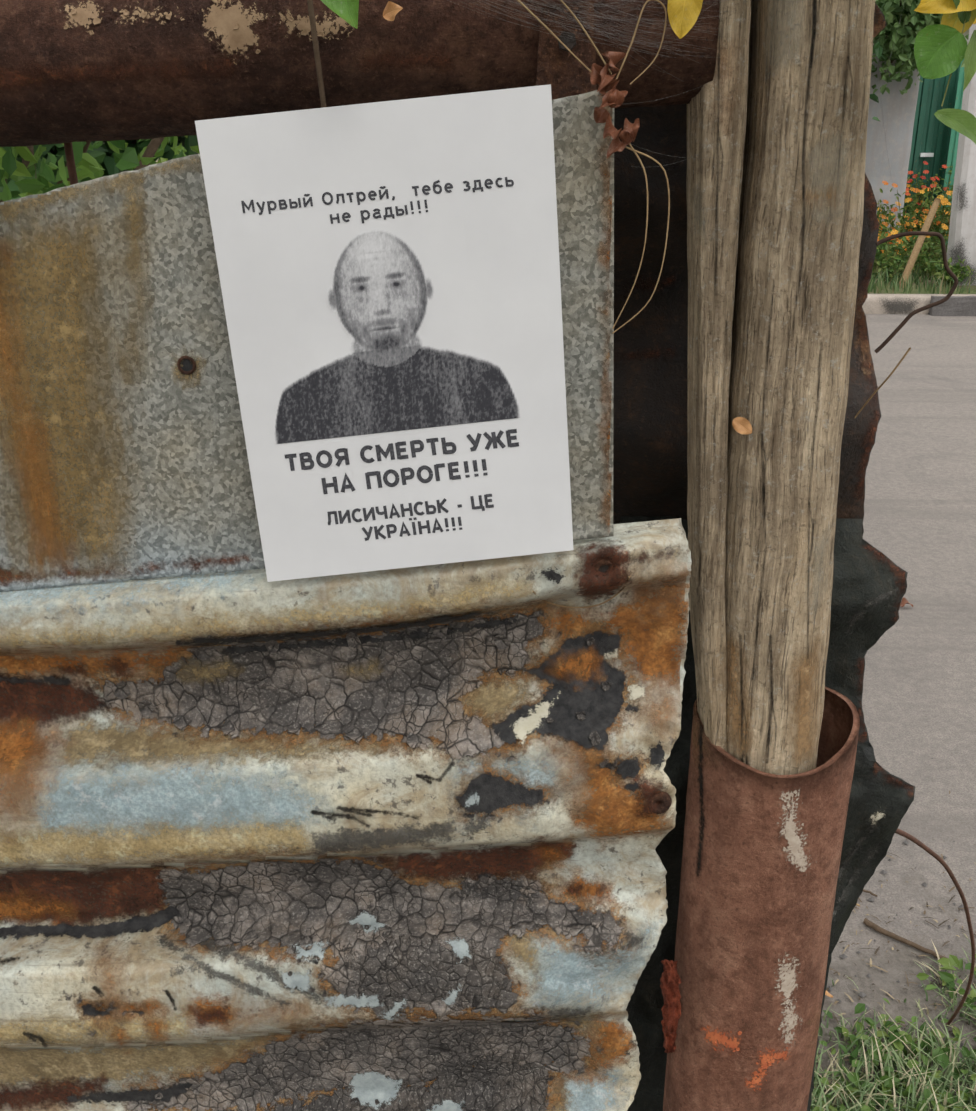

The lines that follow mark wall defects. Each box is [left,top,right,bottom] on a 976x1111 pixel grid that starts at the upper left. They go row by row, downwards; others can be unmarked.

peeling [57,0,185,35]
peeling [202,0,360,65]
corrosion [0,583,531,810]
crack [86,601,554,784]
corrosion [375,540,691,881]
peeling [510,690,561,744]
peeling [627,684,645,702]
corrosion [0,822,309,926]
corrosion [559,875,616,906]
crack [122,806,632,1111]